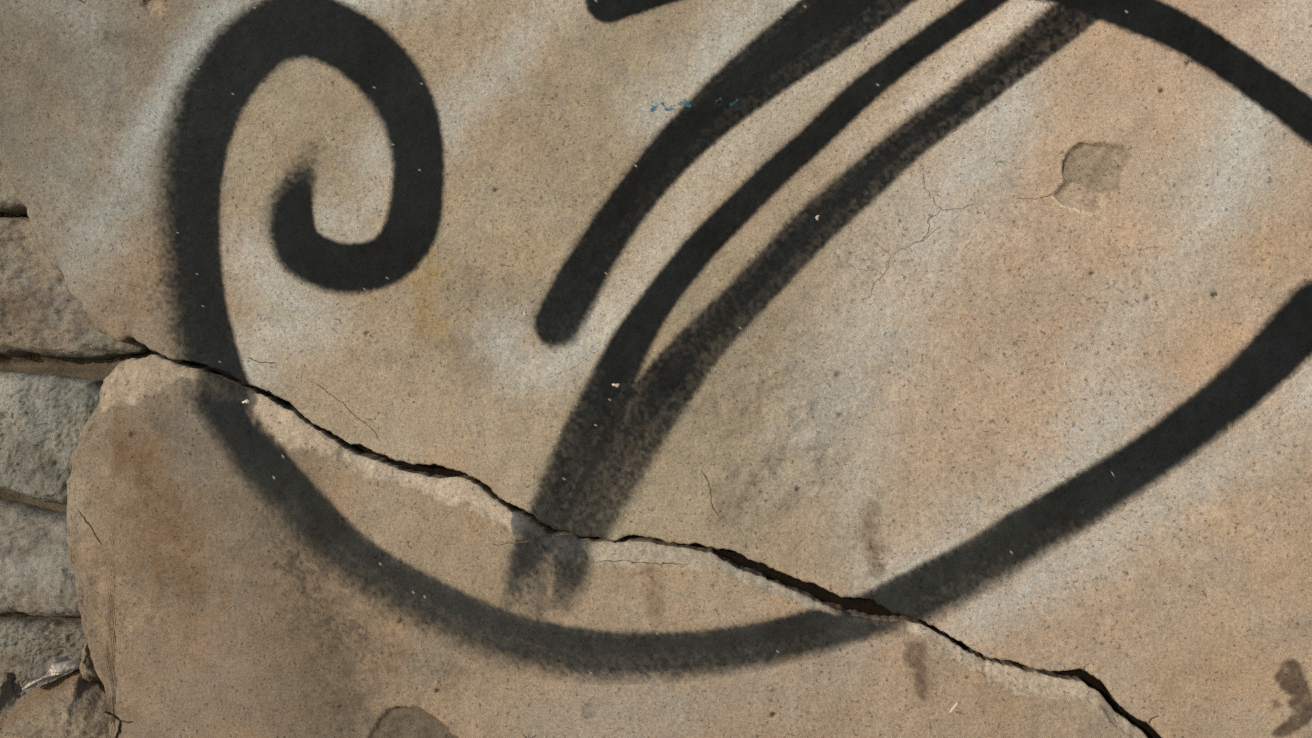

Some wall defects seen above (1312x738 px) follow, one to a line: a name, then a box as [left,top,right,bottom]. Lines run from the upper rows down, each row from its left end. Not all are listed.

spalling [1050,140,1134,219]
crack [123,349,293,406]
crack [315,383,1161,738]